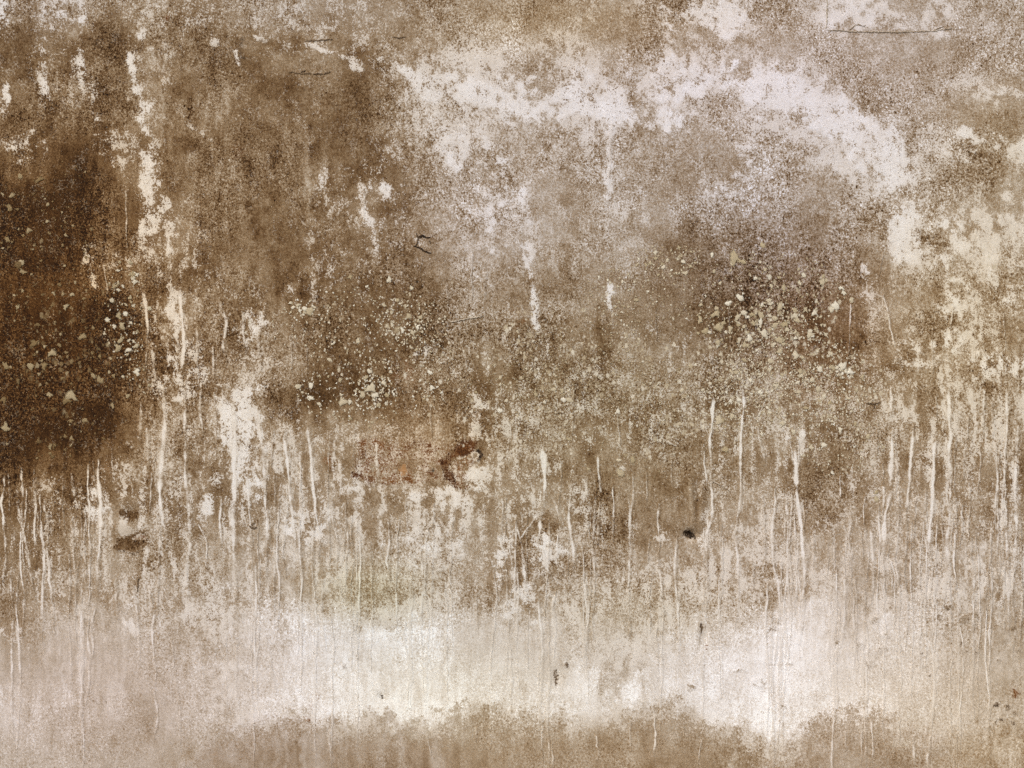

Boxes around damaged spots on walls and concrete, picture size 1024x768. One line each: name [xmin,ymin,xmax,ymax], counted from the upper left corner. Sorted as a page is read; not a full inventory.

crack [825,0,952,33]
efflorescence [355,177,394,254]
crack [413,232,431,254]
damp [393,0,1024,386]
efflorescence [176,286,216,444]
efflorescence [236,305,262,378]
efflorescence [225,398,244,600]
rust [322,433,484,492]
damp [959,532,988,734]
damp [866,702,932,768]
damp [926,666,958,768]
damp [961,624,1024,768]